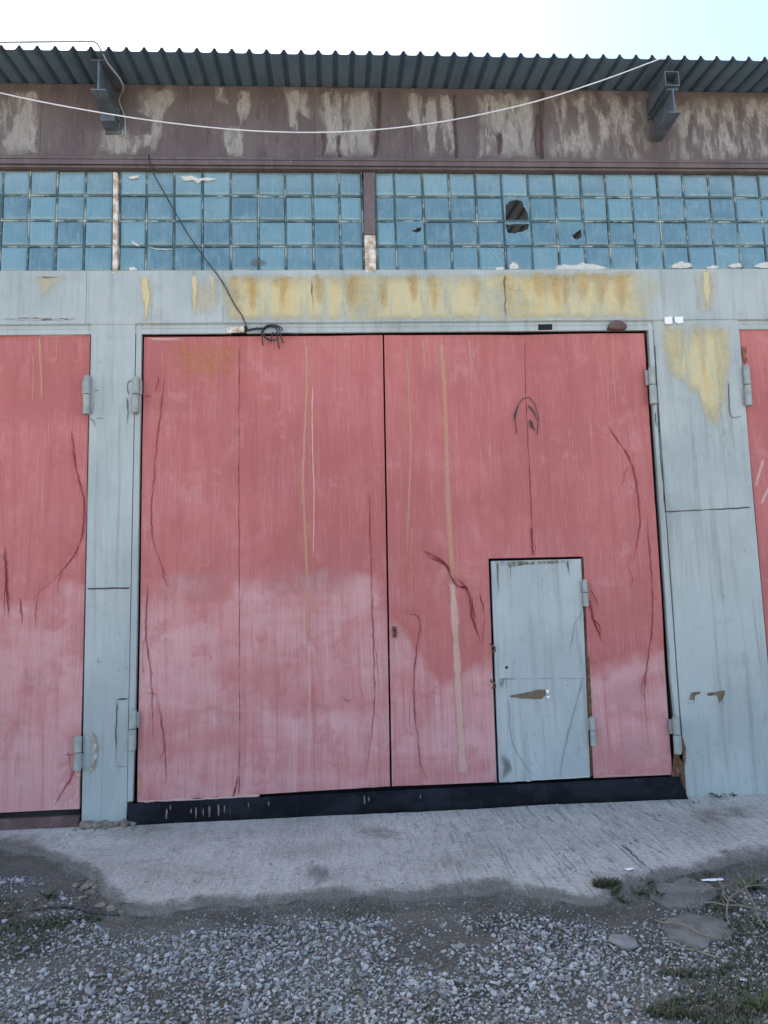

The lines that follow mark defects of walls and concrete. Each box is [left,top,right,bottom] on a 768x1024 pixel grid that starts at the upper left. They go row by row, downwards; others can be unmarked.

peeling [0,92,37,154]
peeling [102,88,175,154]
peeling [223,91,251,157]
peeling [285,89,373,155]
peeling [408,93,455,152]
peeling [478,93,532,156]
peeling [553,94,646,159]
peeling [673,99,768,160]
water stain [450,584,467,773]